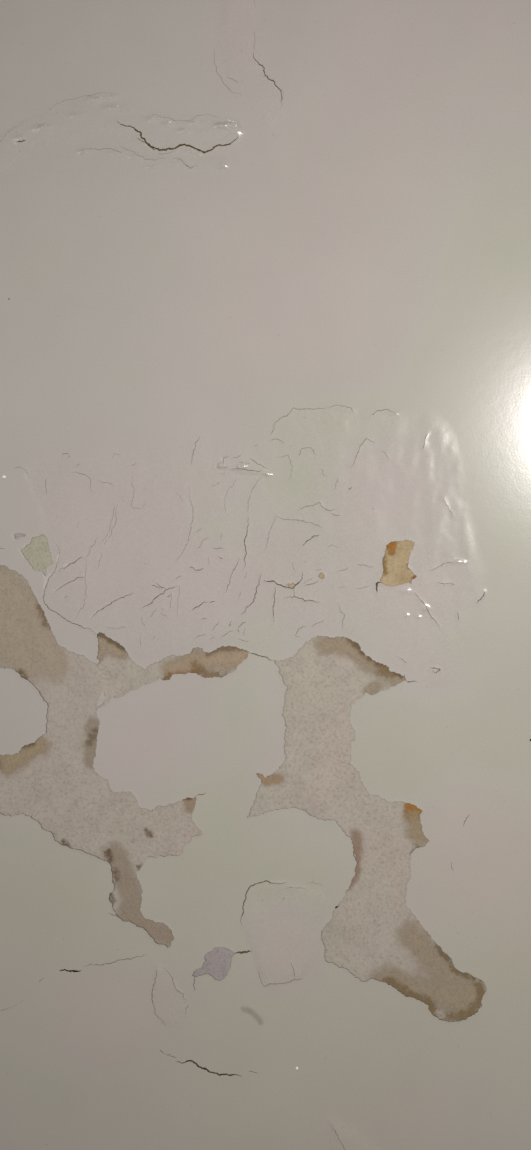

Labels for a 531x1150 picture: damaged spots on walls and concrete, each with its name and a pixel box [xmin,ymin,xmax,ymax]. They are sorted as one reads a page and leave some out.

crack [253,53,282,100]
crack [117,121,238,153]
crack [43,556,204,634]
crack [242,523,318,618]
peeling [378,537,419,589]
peeling [0,531,251,950]
peeling [245,633,489,1024]
peeling [190,945,237,982]
crack [4,956,257,1077]